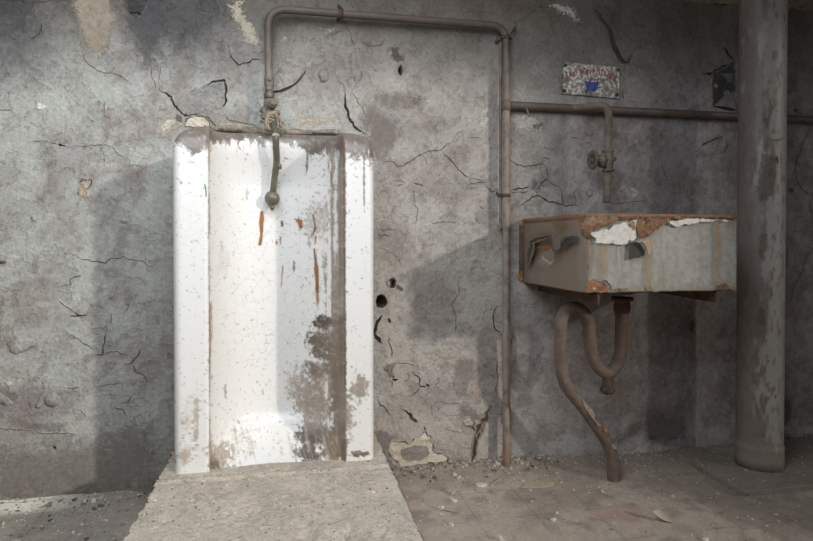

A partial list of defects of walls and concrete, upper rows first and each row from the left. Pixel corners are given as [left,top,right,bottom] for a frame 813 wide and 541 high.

peeling [72,0,151,55]
peeling [227,0,264,48]
flaking render [710,61,737,108]
crack [327,22,589,265]
crack [373,305,517,461]
flaking render [387,430,449,468]